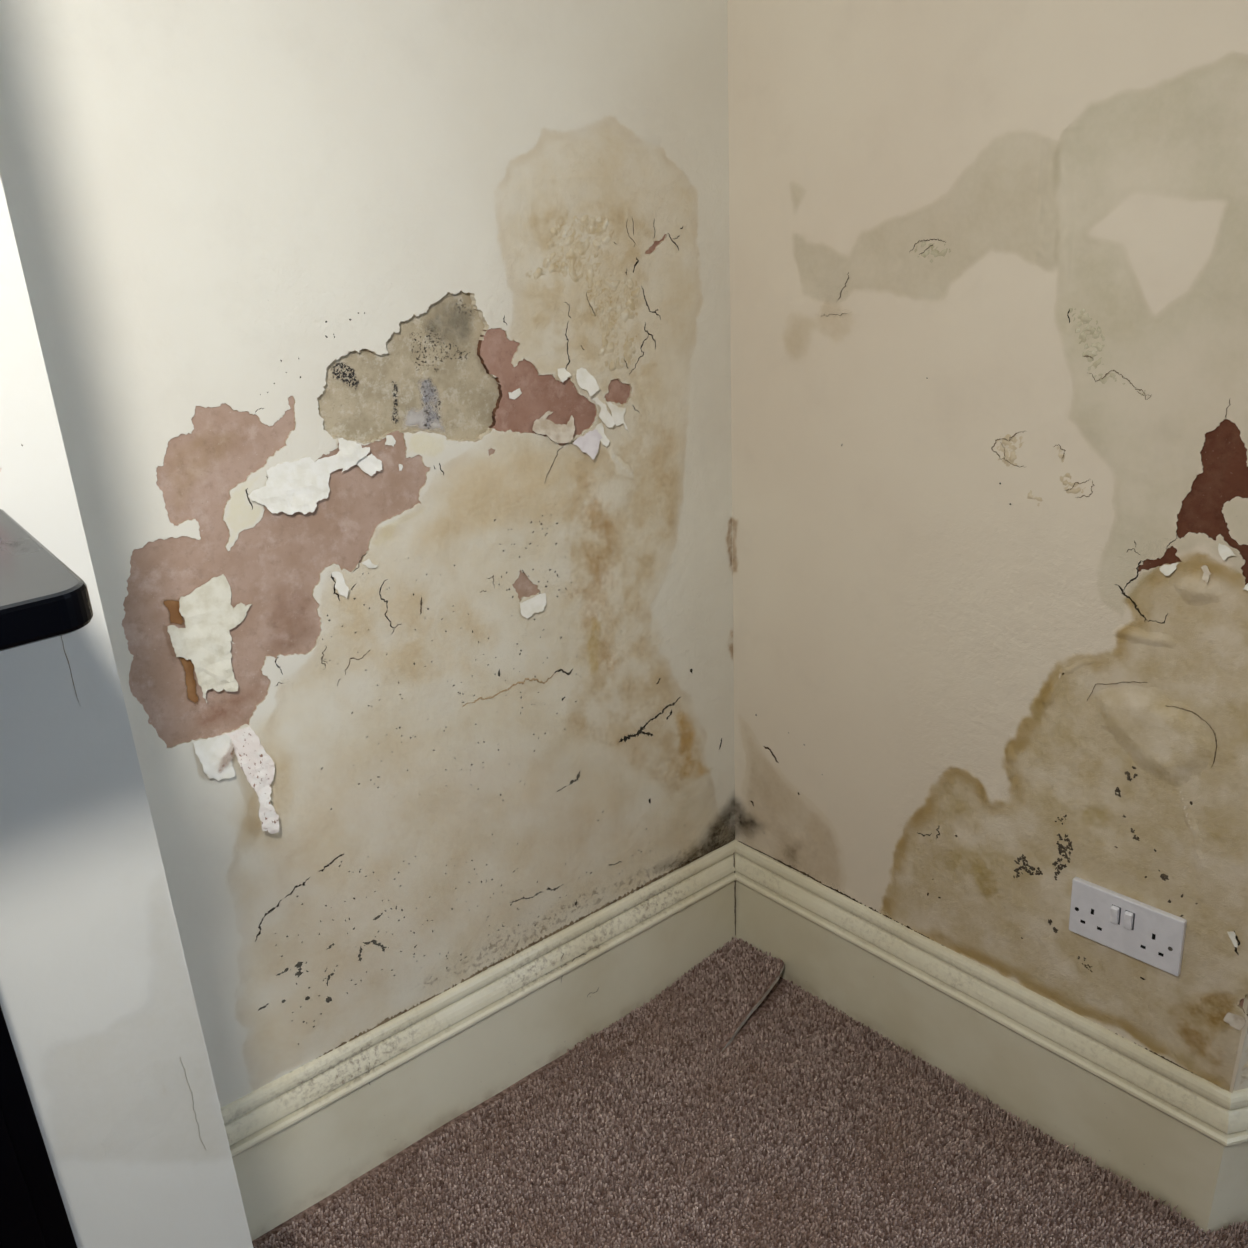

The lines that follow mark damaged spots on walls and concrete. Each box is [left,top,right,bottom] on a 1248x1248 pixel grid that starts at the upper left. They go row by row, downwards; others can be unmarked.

crack [614,219,683,372]
peeling [122,214,640,834]
peeling [1138,419,1248,591]
crack [462,674,554,707]
damp [620,697,681,742]
crack [1167,706,1217,766]
damp [683,803,753,864]
mould [1013,814,1073,881]
damp [258,933,338,1028]
crack [255,854,344,942]
damp [319,891,467,994]
damp [466,881,578,945]